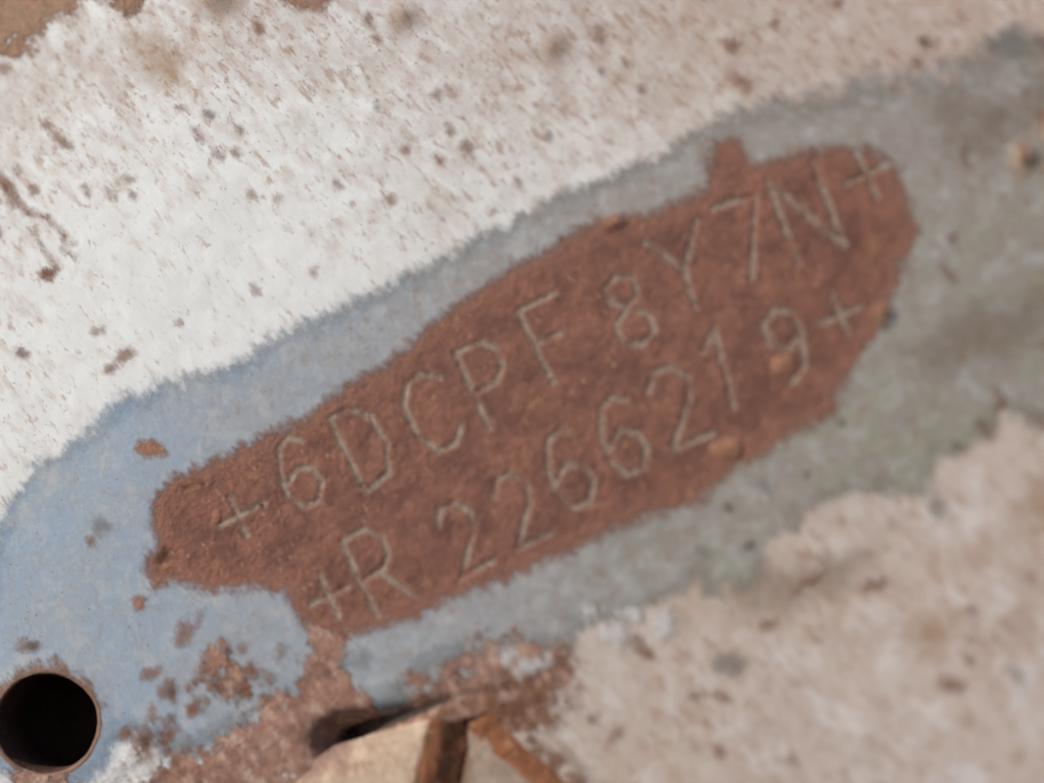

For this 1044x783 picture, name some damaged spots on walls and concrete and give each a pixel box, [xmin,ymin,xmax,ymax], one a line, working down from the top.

corrosion [0,176,43,217]
corrosion [120,139,918,783]
peeling [411,644,459,670]
peeling [514,651,552,675]
peeling [378,683,401,711]
peeling [0,755,52,782]
corrosion [10,769,81,783]
peeling [124,749,160,779]